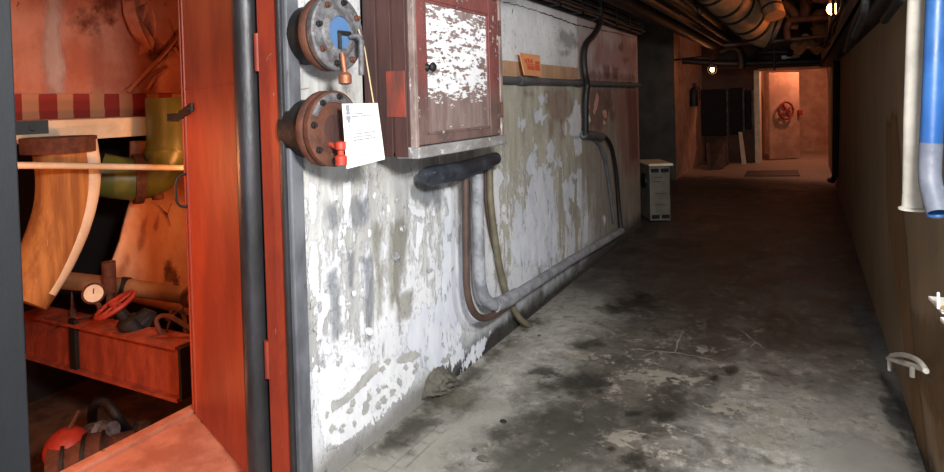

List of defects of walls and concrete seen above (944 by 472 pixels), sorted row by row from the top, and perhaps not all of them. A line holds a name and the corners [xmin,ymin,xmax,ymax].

peeling [307,181,492,451]
water stain [380,240,622,449]